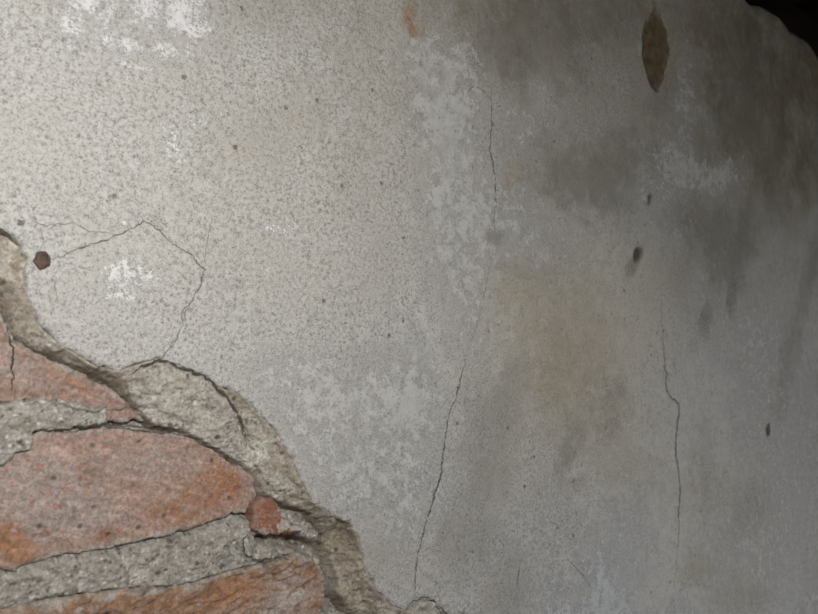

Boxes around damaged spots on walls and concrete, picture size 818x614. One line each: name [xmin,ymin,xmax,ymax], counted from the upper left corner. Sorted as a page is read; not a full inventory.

crack [0,217,247,446]
flaking render [0,232,447,614]
crack [412,373,462,614]